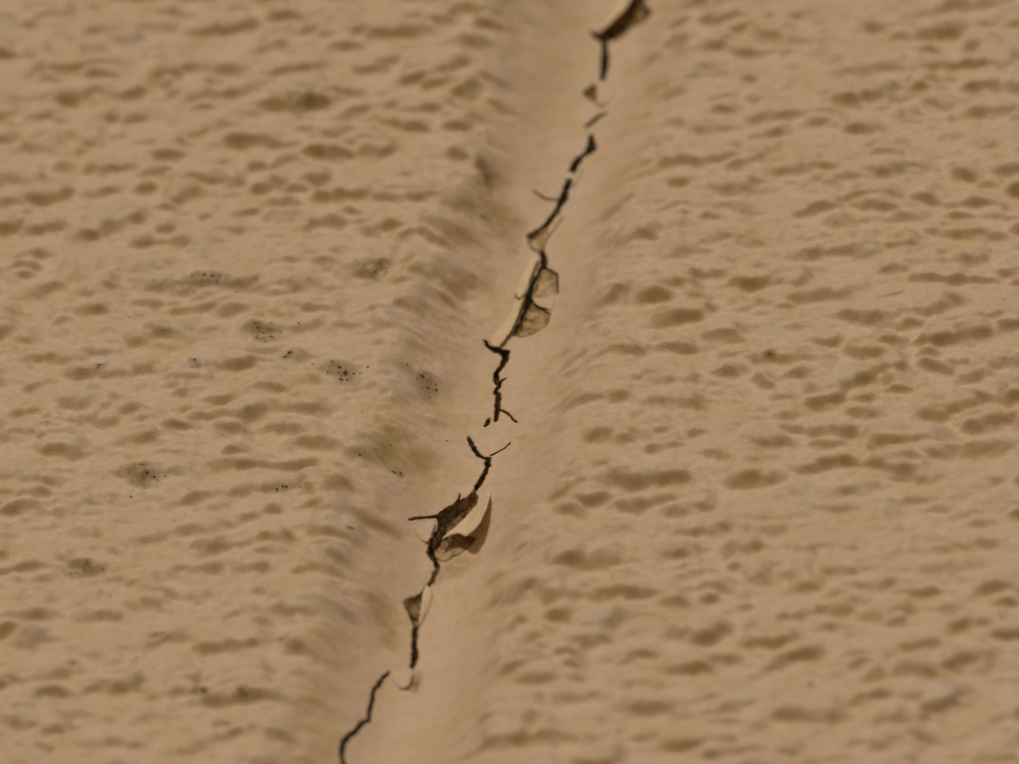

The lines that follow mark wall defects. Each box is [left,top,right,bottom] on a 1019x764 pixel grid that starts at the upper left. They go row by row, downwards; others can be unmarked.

crack [599,38,610,81]
peeling [589,0,652,48]
peeling [490,210,564,347]
crack [408,112,607,588]
peeling [414,490,491,562]
crack [339,626,419,764]